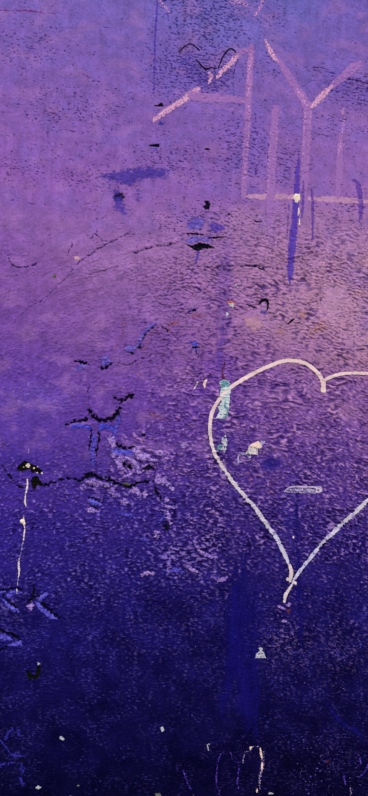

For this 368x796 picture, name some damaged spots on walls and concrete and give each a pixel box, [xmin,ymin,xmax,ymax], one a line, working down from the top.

crack [3,385,161,500]